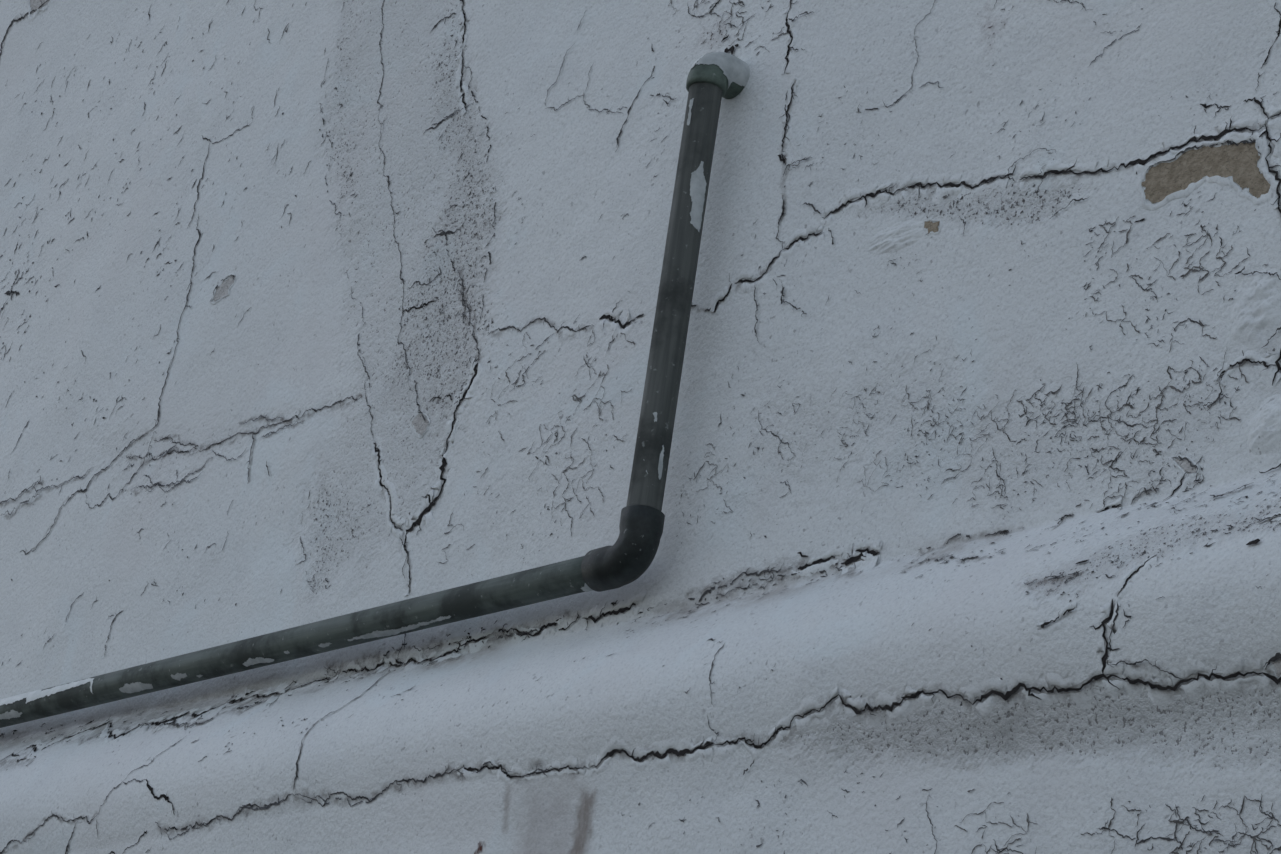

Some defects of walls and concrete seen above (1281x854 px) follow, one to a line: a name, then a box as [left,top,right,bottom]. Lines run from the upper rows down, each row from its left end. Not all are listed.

peeling [0,54,150,362]
peeling [110,4,226,207]
crack [668,0,1281,602]
peeling [1066,220,1178,347]
peeling [1136,132,1279,247]
peeling [37,347,138,493]
peeling [890,337,976,496]
crack [0,554,1281,854]